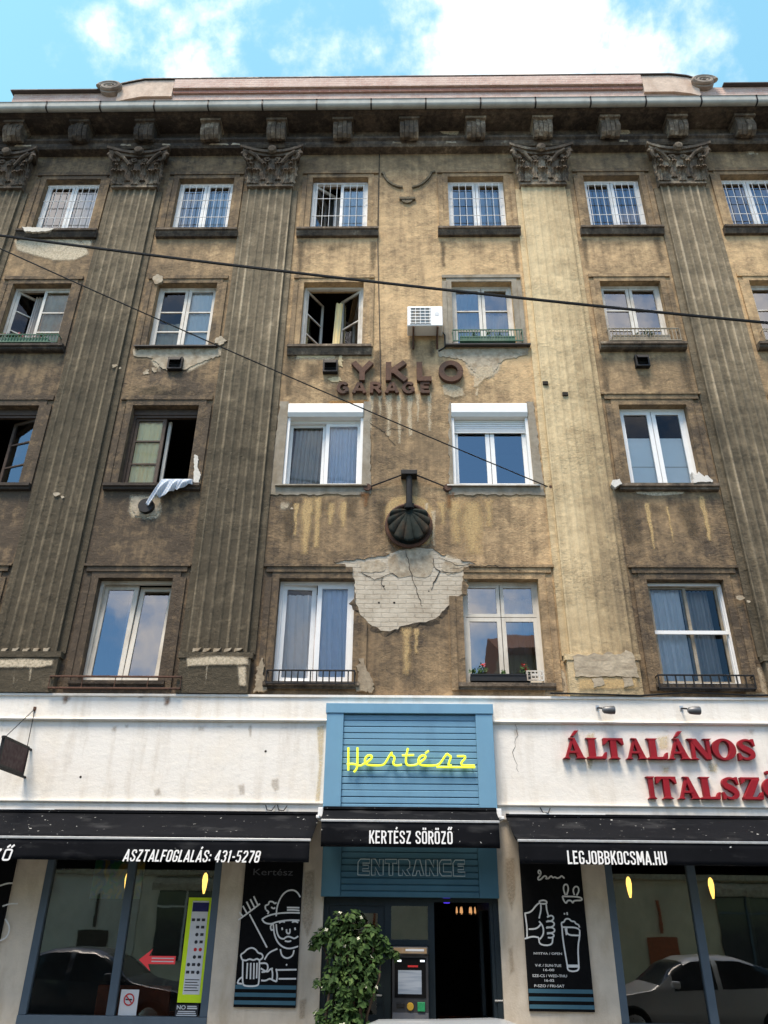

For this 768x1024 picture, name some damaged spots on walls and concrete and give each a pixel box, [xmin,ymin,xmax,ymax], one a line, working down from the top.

peeling [15,227,91,260]
spalling [133,336,227,375]
peeling [443,367,493,397]
damp [369,394,432,442]
damp [384,496,492,553]
spalling [335,544,478,637]
crack [360,555,525,606]